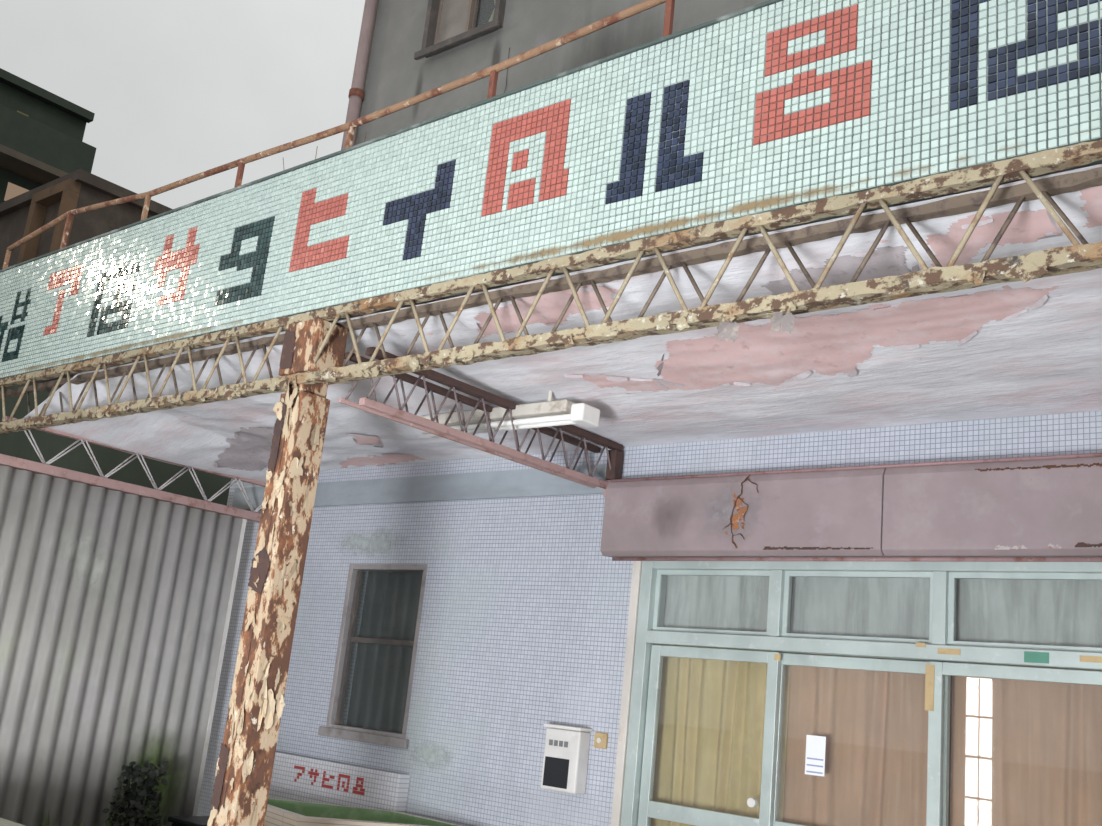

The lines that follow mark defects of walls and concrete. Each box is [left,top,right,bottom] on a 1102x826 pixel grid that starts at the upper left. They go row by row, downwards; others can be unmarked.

rust [510,187,834,262]
peeling [1079,186,1102,228]
peeling [564,208,1064,392]
rust [27,328,208,370]
rust [279,329,295,369]
peeling [330,363,392,380]
peeling [409,351,473,372]
rust [267,401,286,472]
crack [723,475,759,548]
rust [248,547,271,594]
rust [211,743,229,811]